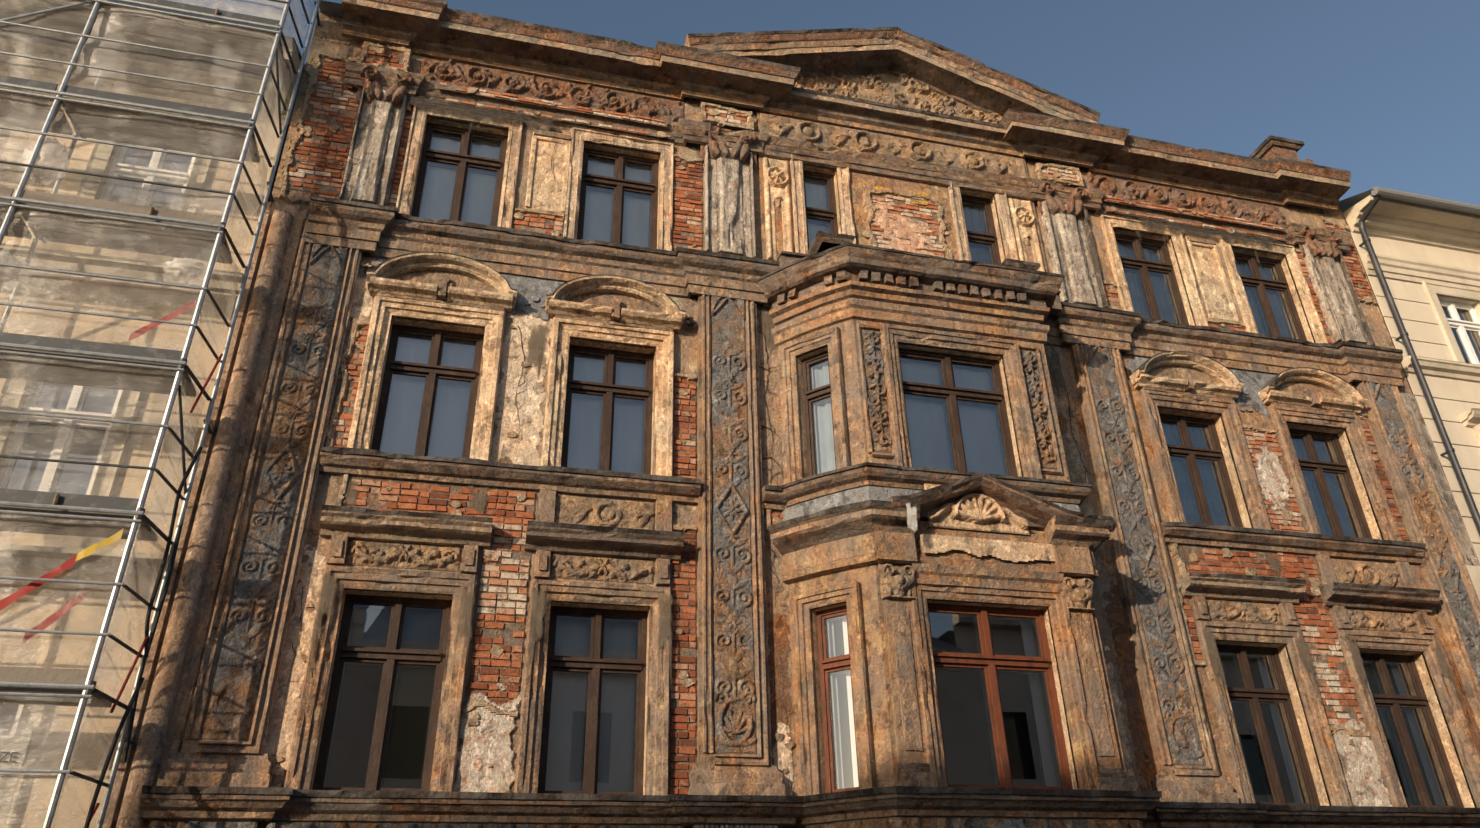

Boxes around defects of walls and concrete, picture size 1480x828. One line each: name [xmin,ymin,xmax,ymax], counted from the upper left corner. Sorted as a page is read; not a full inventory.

flaking render [279,41,414,207]
flaking render [435,82,703,251]
flaking render [862,189,953,259]
flaking render [324,257,387,447]
flaking render [673,373,697,478]
peeling [1120,352,1149,380]
flaking render [1230,369,1307,533]
flaking render [334,474,536,793]
flaking render [1169,543,1405,807]